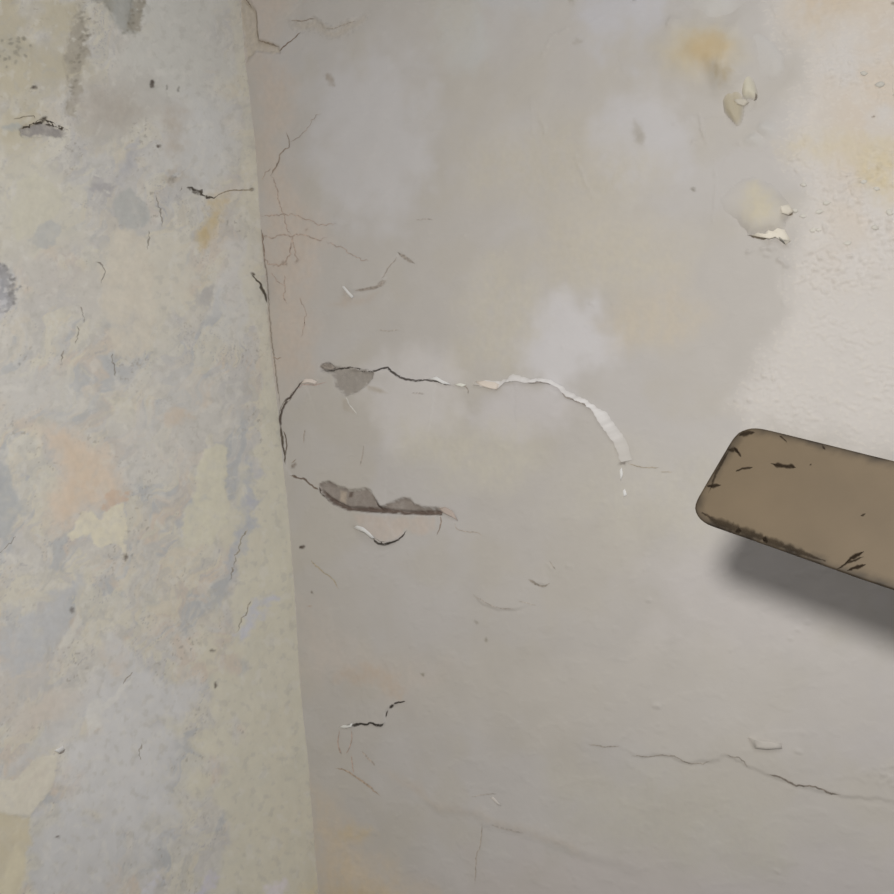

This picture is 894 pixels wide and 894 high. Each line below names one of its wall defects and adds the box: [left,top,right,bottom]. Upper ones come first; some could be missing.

crack [147,197,163,250]
peeling [0,260,24,325]
crack [179,113,671,497]
flaking render [319,361,389,417]
flaking render [318,480,483,546]
crack [335,701,405,796]
crack [589,744,747,767]
crack [767,774,839,795]